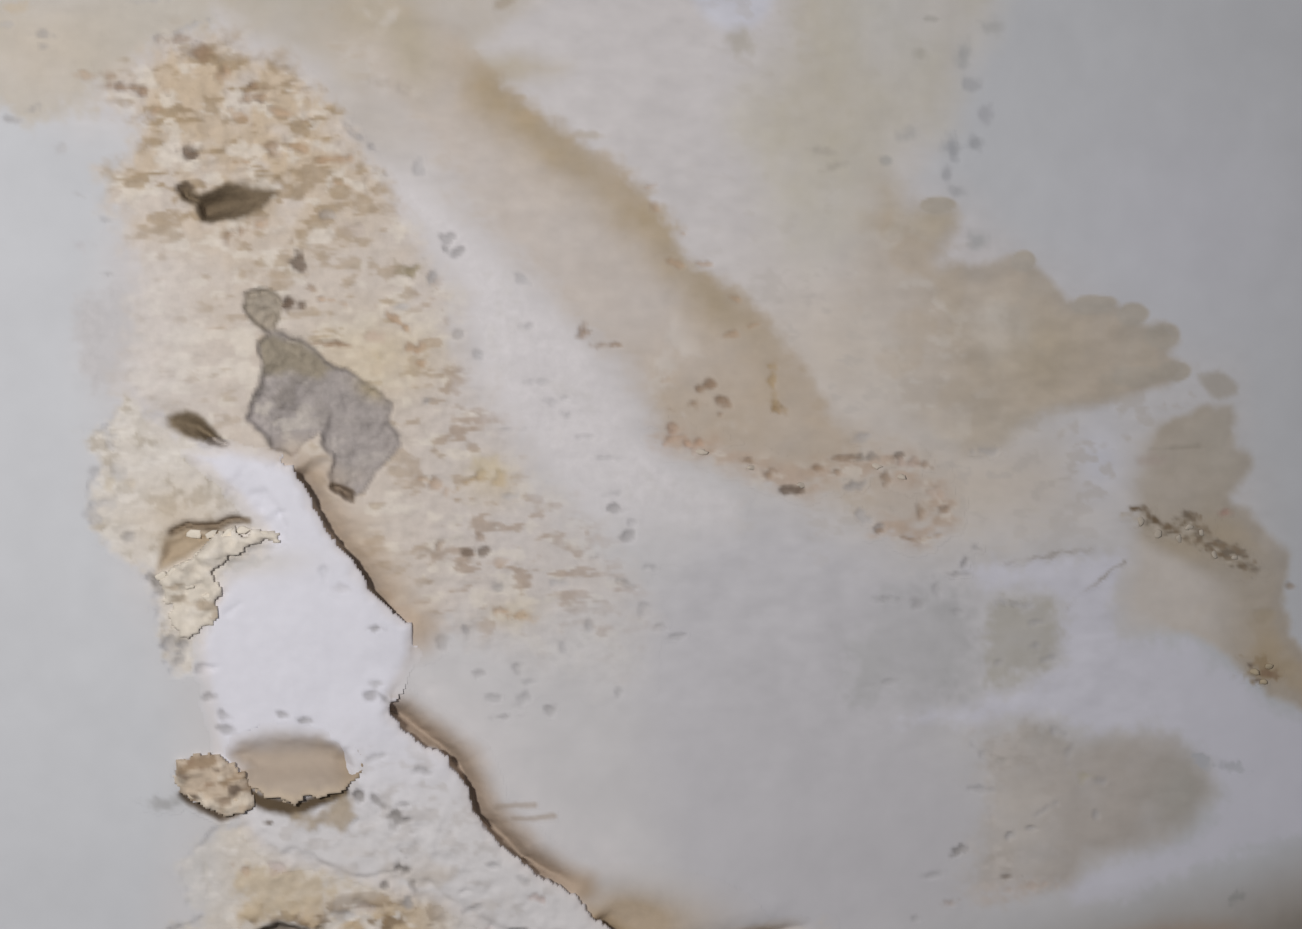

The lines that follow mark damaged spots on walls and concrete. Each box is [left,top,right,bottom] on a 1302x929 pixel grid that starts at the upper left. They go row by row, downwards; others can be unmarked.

spalling [68,13,755,929]
damp [0,0,1302,716]
damp [819,568,1302,929]